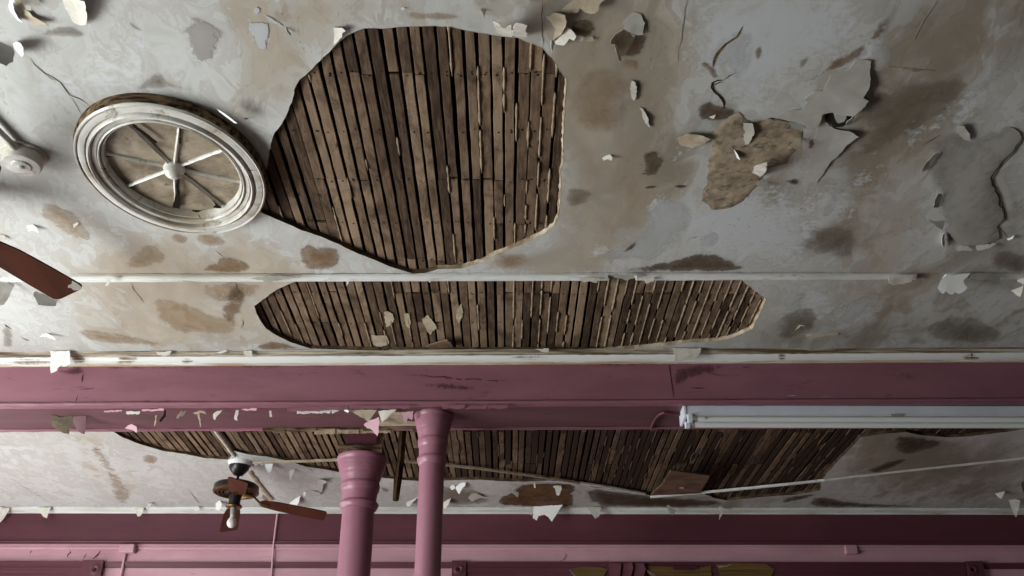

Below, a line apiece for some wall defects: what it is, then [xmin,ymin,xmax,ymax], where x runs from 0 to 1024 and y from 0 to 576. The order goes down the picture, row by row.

crack [32,61,87,111]
crack [711,28,742,107]
flaking render [678,59,871,210]
flaking render [254,0,767,364]
damp [301,246,338,268]
damp [639,255,741,272]
damp [162,287,247,330]
flaking render [104,408,347,505]
flaking render [287,405,419,492]
flaking render [443,428,1024,521]